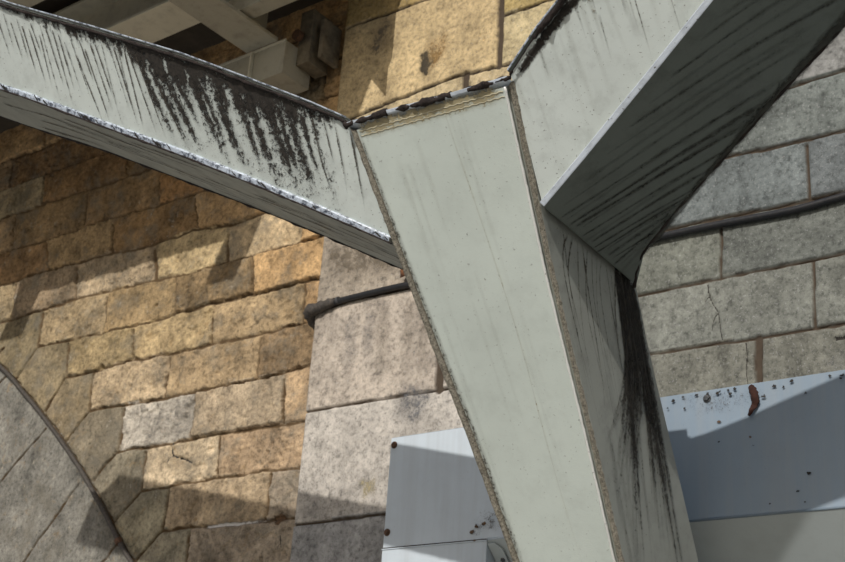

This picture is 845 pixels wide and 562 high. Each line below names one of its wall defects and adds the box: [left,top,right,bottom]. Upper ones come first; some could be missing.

damp [0,20,398,278]
damp [420,51,433,75]
damp [563,100,755,559]
crack [705,285,723,340]